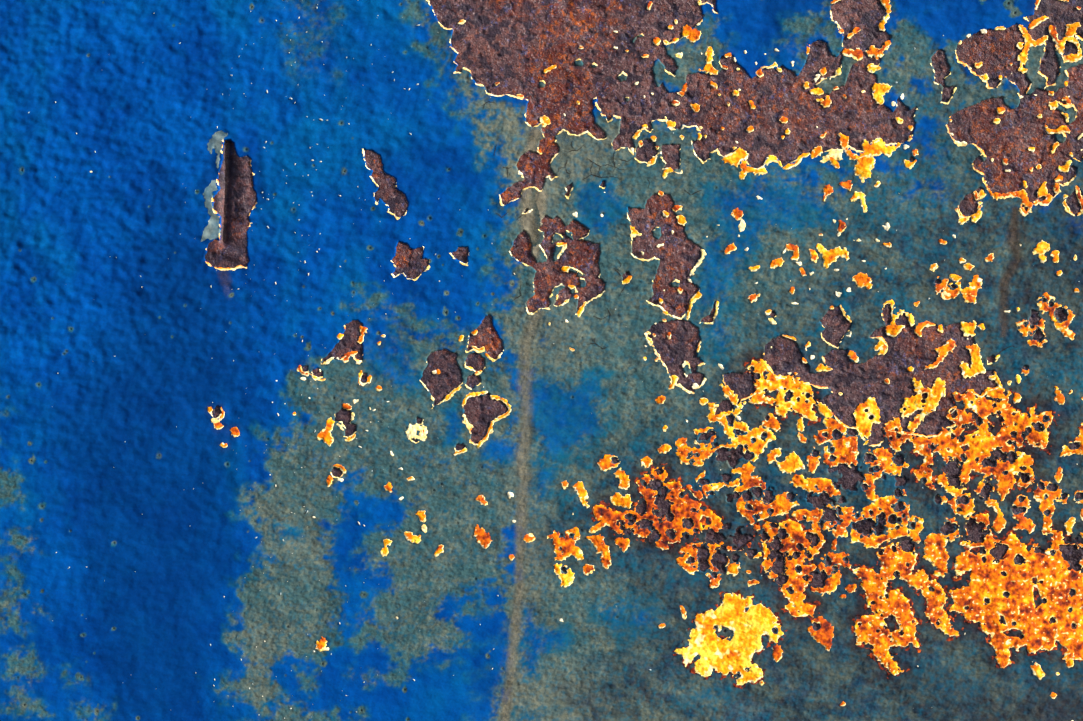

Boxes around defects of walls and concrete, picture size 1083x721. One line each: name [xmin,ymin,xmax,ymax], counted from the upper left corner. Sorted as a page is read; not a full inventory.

peeling [201,130,228,242]
corrosion [205,140,257,271]
corrosion [362,148,408,220]
corrosion [391,242,430,281]
corrosion [297,320,382,391]
corrosion [405,417,428,444]
corrosion [380,539,392,556]
corrosion [404,531,421,544]